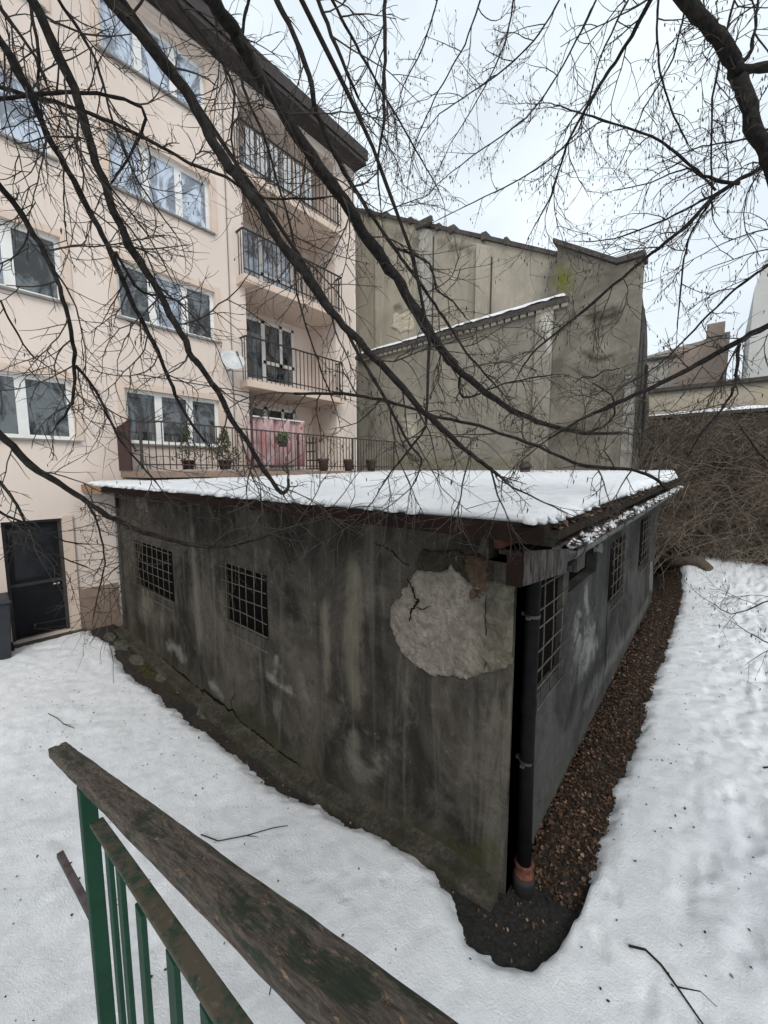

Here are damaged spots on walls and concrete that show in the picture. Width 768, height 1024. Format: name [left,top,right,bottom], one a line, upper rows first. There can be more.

spalling [390,549,515,680]